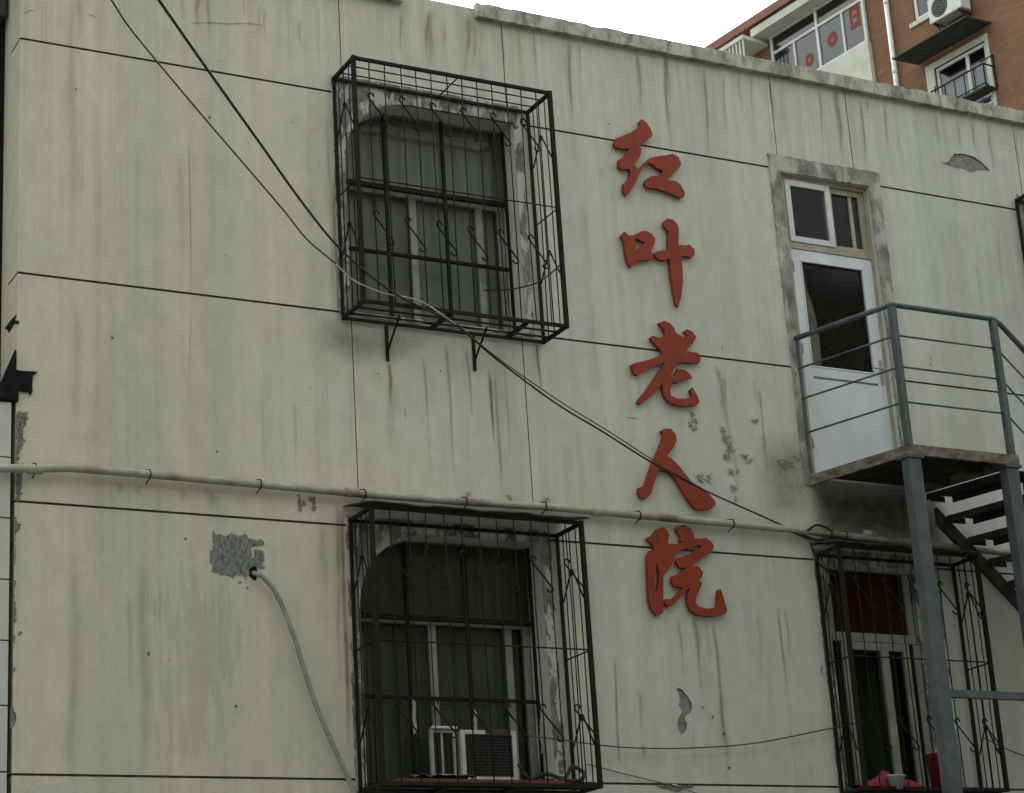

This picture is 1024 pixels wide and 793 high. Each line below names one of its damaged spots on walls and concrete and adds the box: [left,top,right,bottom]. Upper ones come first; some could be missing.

spalling [942,153,990,173]
spalling [15,410,28,502]
peeling [720,425,753,503]
peeling [297,494,317,512]
peeling [238,539,265,589]
spalling [676,687,714,735]